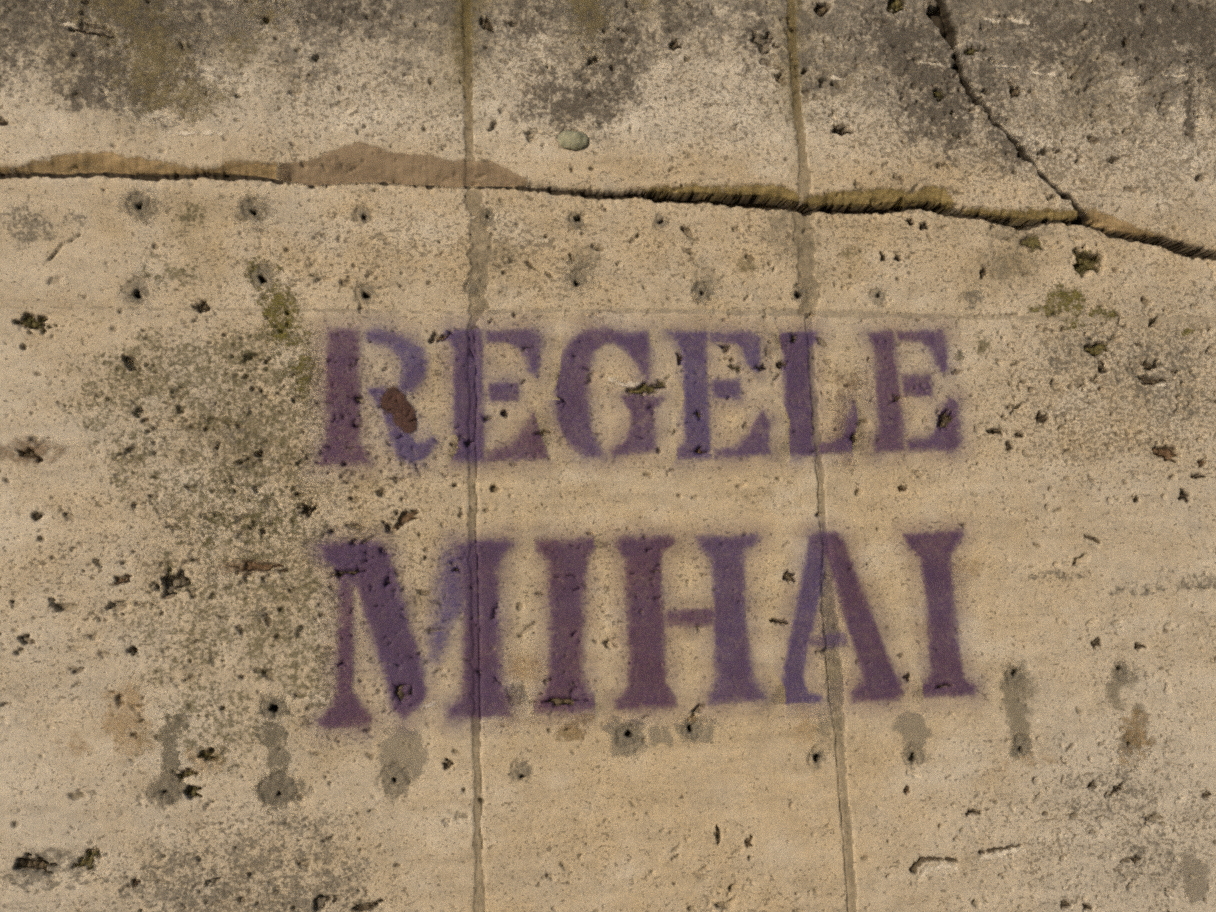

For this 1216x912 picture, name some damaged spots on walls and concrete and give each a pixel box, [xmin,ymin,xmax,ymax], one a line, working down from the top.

crack [464,0,1216,260]
crack [0,172,314,188]
crack [347,181,435,189]